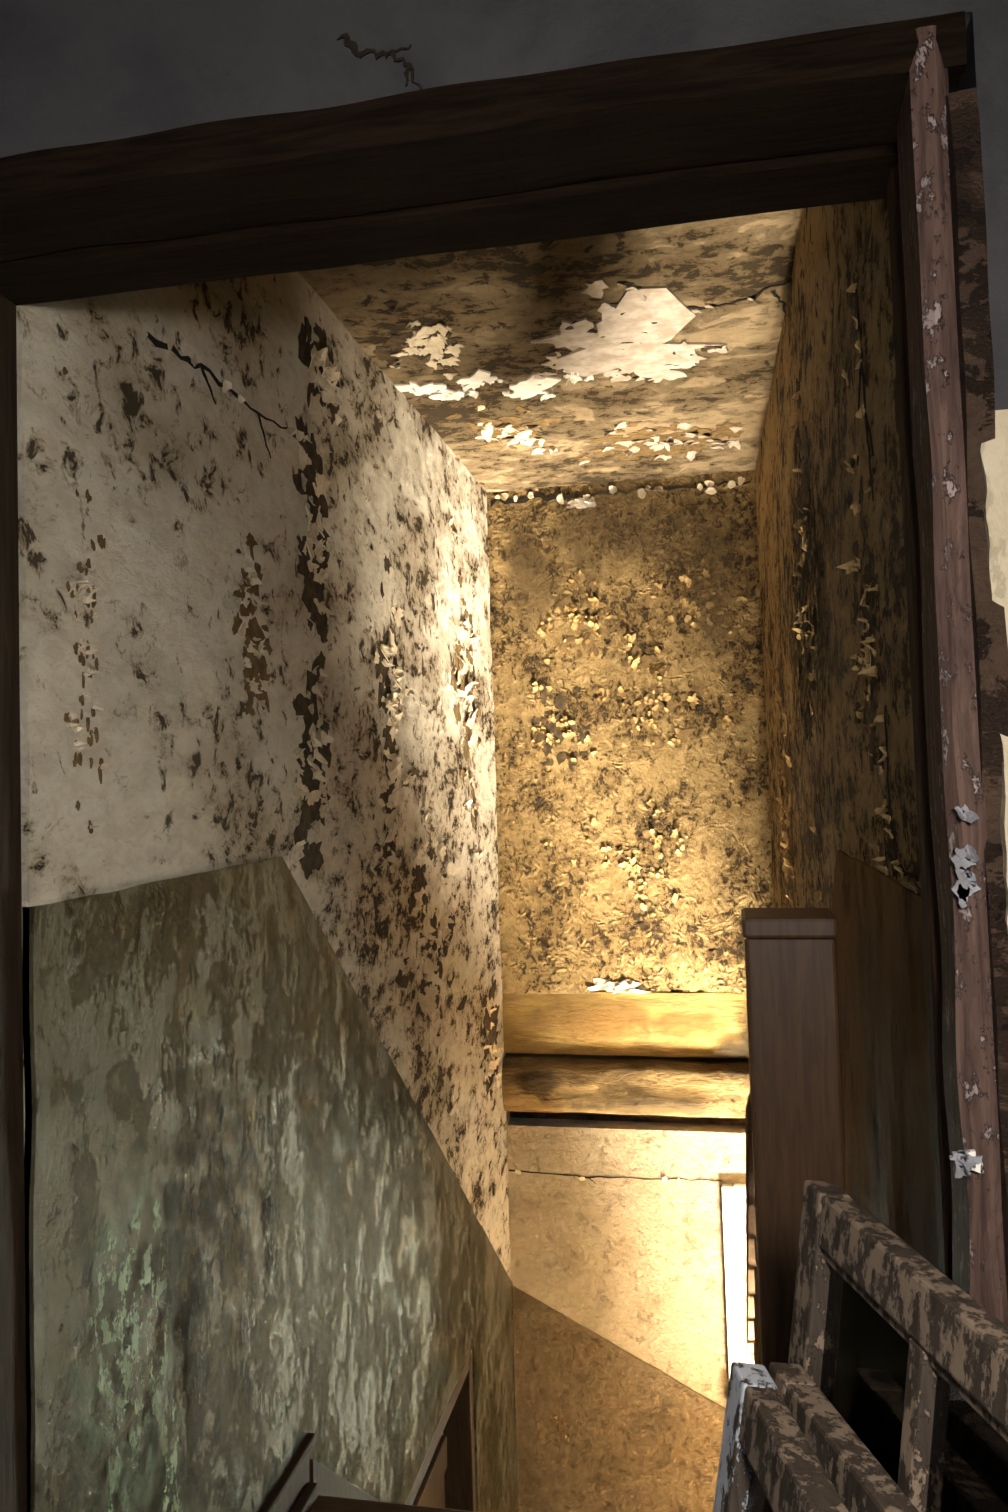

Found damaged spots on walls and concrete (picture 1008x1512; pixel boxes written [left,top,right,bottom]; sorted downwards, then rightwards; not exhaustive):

crack [337,33,422,90]
flaking render [373,278,728,455]
peeling [577,421,744,465]
water stain [792,429,826,817]